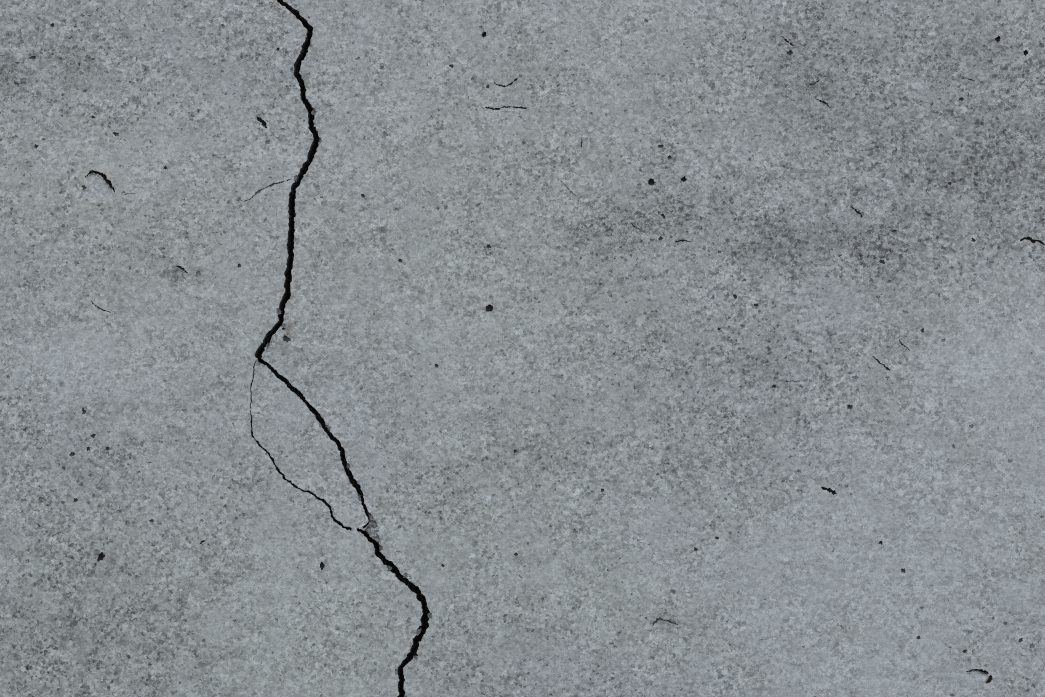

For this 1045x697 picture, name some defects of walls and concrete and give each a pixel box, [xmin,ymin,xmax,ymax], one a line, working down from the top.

crack [244,0,432,697]